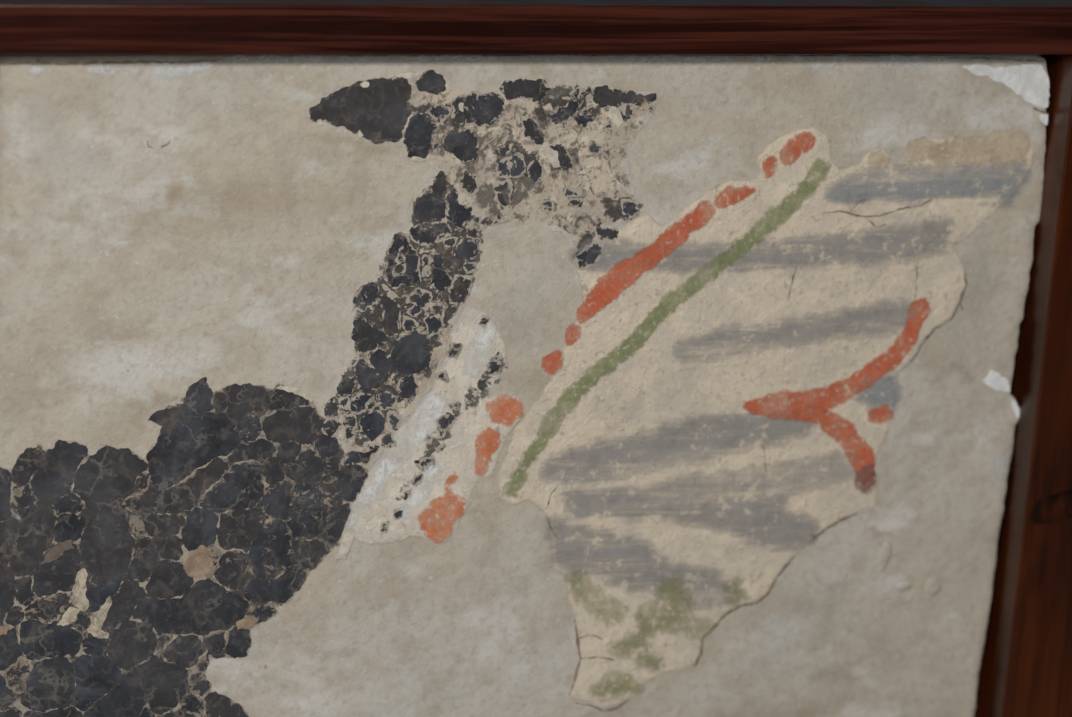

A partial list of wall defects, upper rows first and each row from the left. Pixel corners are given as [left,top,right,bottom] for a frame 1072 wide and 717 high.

spalling [227,55,331,63]
spalling [878,56,1050,125]
crack [827,198,933,228]
spalling [982,370,1020,419]
crack [694,513,858,666]
crack [569,618,629,712]